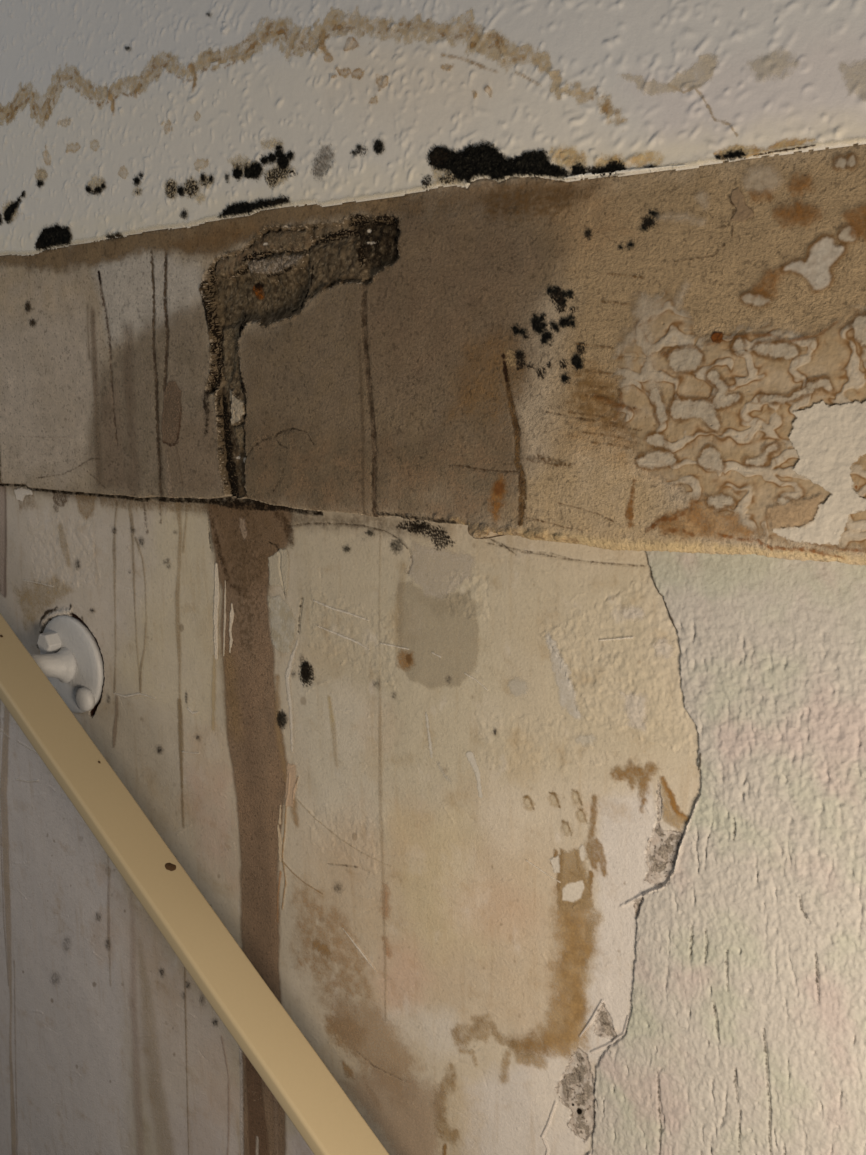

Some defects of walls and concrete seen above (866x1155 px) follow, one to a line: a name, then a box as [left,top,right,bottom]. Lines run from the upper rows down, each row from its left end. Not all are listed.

leakage [0,9,593,126]
crack [0,428,408,551]
leakage [0,139,662,1004]
peeling [212,563,234,729]
peeling [268,549,322,921]
leakage [612,764,688,828]
peeling [646,782,683,887]
leakage [0,710,17,1155]
leakage [453,790,606,1082]
leakage [213,1021,286,1155]
peeling [555,1048,596,1142]
peeling [595,1003,616,1040]